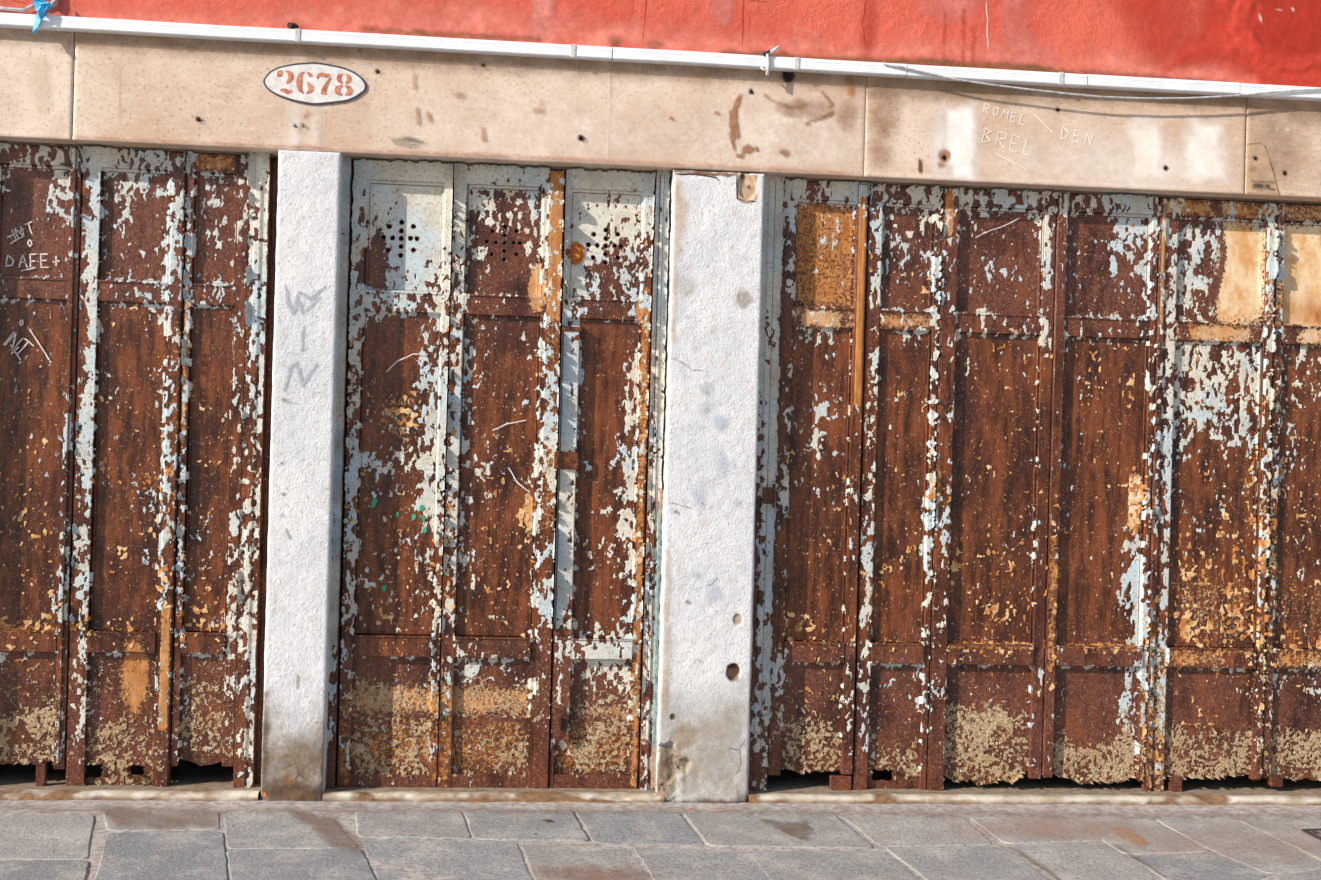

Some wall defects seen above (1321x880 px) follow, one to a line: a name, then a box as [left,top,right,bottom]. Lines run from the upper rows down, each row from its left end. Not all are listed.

corrosion [0,274,234,733]
peeling [0,143,270,788]
corrosion [322,156,663,803]
corrosion [773,580,862,716]
peeling [327,91,1321,801]
corrosion [783,197,937,411]
corrosion [860,528,921,611]
corrosion [830,434,963,511]
corrosion [939,314,1032,398]
corrosion [879,395,1321,805]
corrosion [1050,336,1160,413]
corrosion [853,793,971,804]